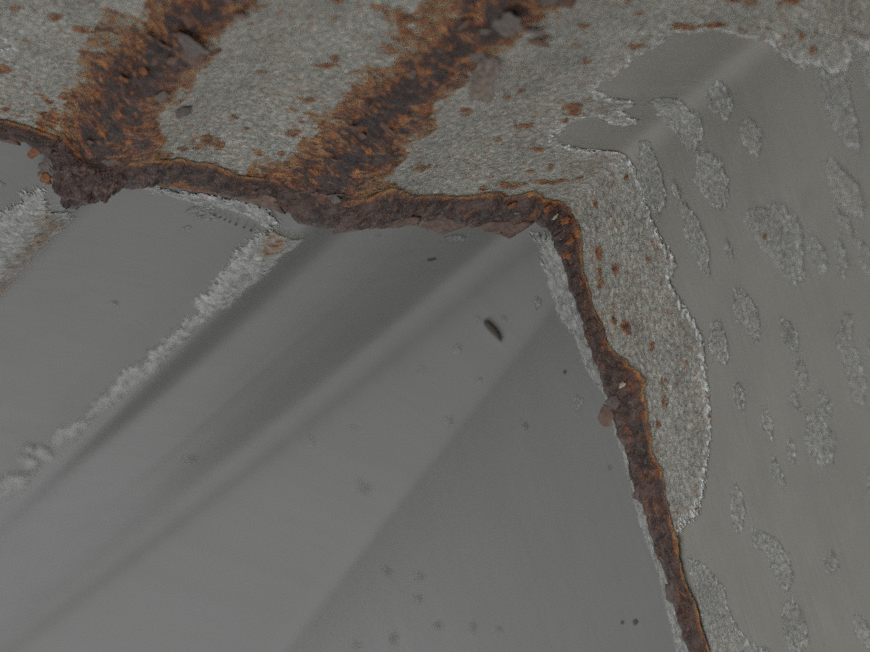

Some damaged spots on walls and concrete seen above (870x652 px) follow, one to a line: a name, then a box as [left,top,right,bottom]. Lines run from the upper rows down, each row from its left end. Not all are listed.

peeling [0,0,207,149]
corrosion [0,0,574,239]
peeling [119,0,486,182]
corrosion [562,103,583,124]
corrosion [648,98,728,211]
corrosion [669,23,748,34]
leakage [0,183,78,290]
peeling [352,0,870,536]
leakage [0,229,307,499]